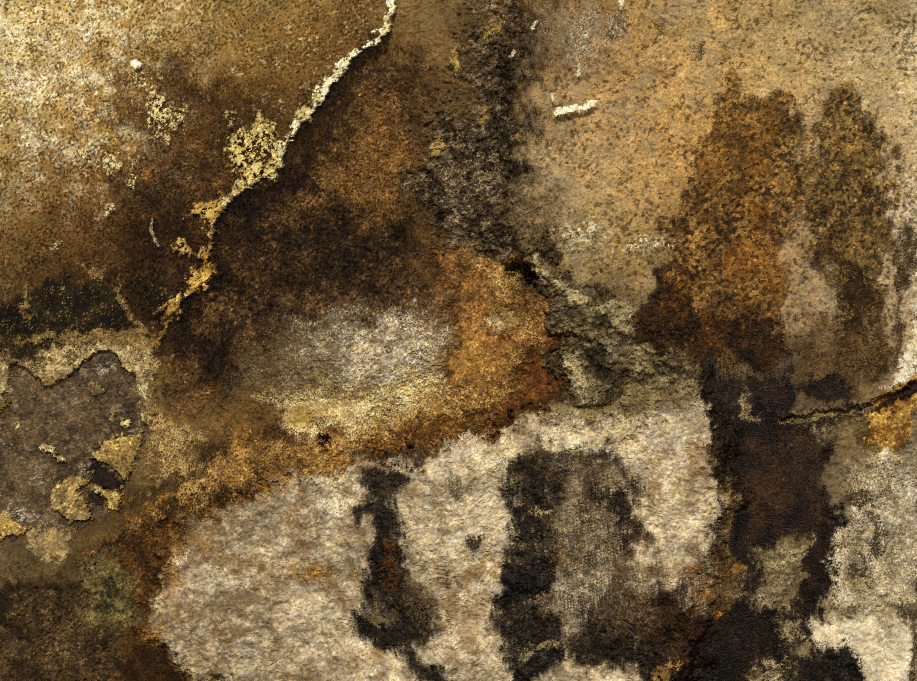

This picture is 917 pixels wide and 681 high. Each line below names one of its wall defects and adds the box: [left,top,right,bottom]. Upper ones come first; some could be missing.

crack [155,0,396,347]
leakage [0,0,625,496]
flaking render [0,328,161,565]
leakage [349,463,448,681]
leakage [445,469,472,501]
leakage [487,287,917,681]
crack [779,375,917,426]